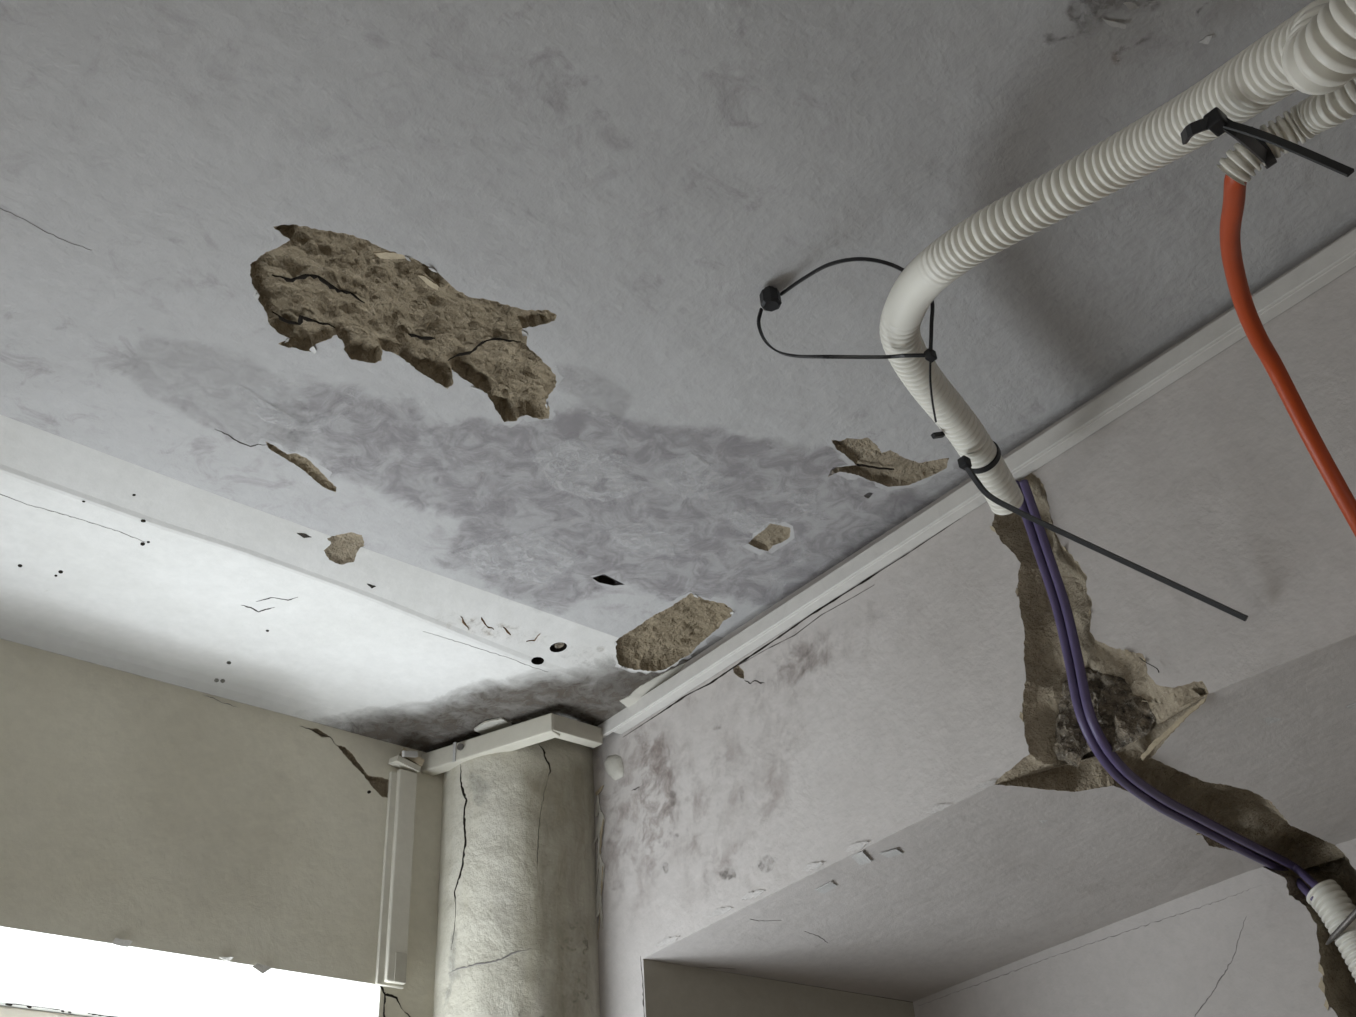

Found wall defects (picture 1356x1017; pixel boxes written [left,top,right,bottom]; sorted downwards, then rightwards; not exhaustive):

crack [0,208,90,250]
spalling [250,224,557,422]
spalling [215,429,337,492]
spalling [324,532,364,565]
water stain [299,398,866,602]
spalling [748,523,791,551]
spalling [828,438,949,498]
spalling [614,593,733,671]
water stain [346,651,703,753]
spalling [302,726,389,798]
crack [537,745,551,873]
crack [448,764,531,974]